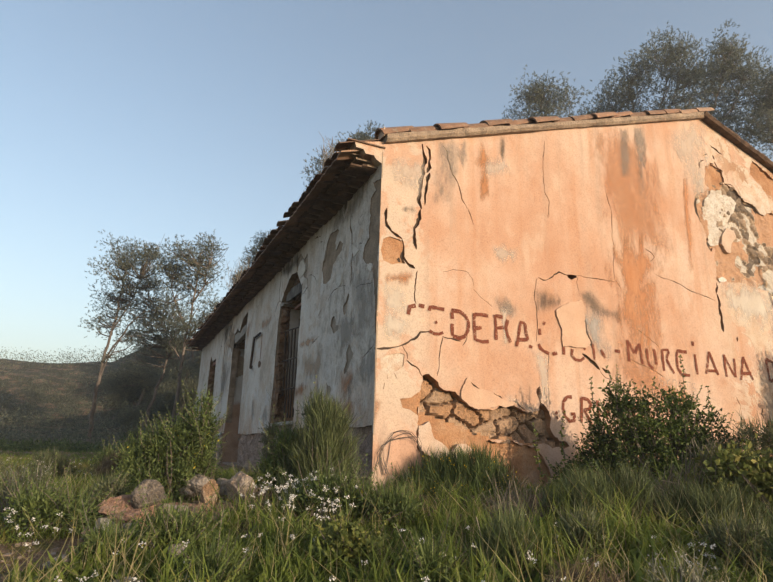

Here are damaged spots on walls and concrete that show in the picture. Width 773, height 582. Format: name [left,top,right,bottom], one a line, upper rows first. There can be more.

peeling [323,230,343,284]
peeling [364,179,403,311]
crack [384,150,461,301]
damp [607,131,660,354]
spalling [695,163,773,296]
peeling [235,337,246,377]
spalling [400,376,566,489]